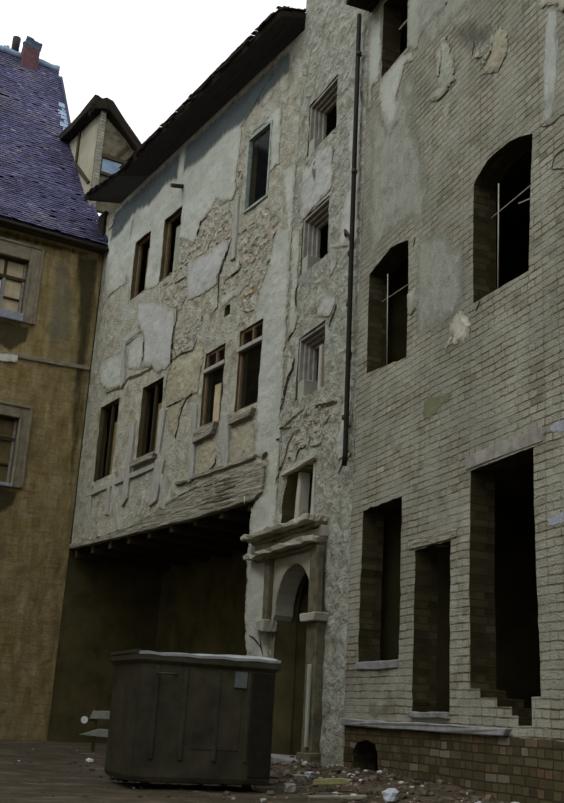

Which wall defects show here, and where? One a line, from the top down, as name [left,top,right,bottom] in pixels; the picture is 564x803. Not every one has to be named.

peeling [338,0,428,251]
peeling [98,103,352,534]
peeling [245,544,273,658]